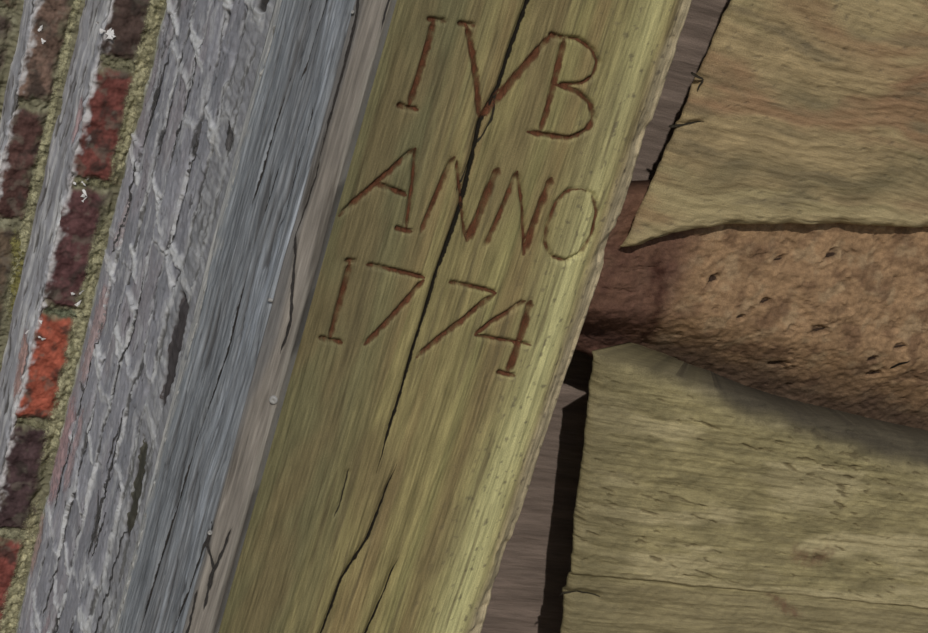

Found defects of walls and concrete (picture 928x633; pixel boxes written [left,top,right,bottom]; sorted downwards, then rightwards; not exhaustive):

crack [320,0,530,633]